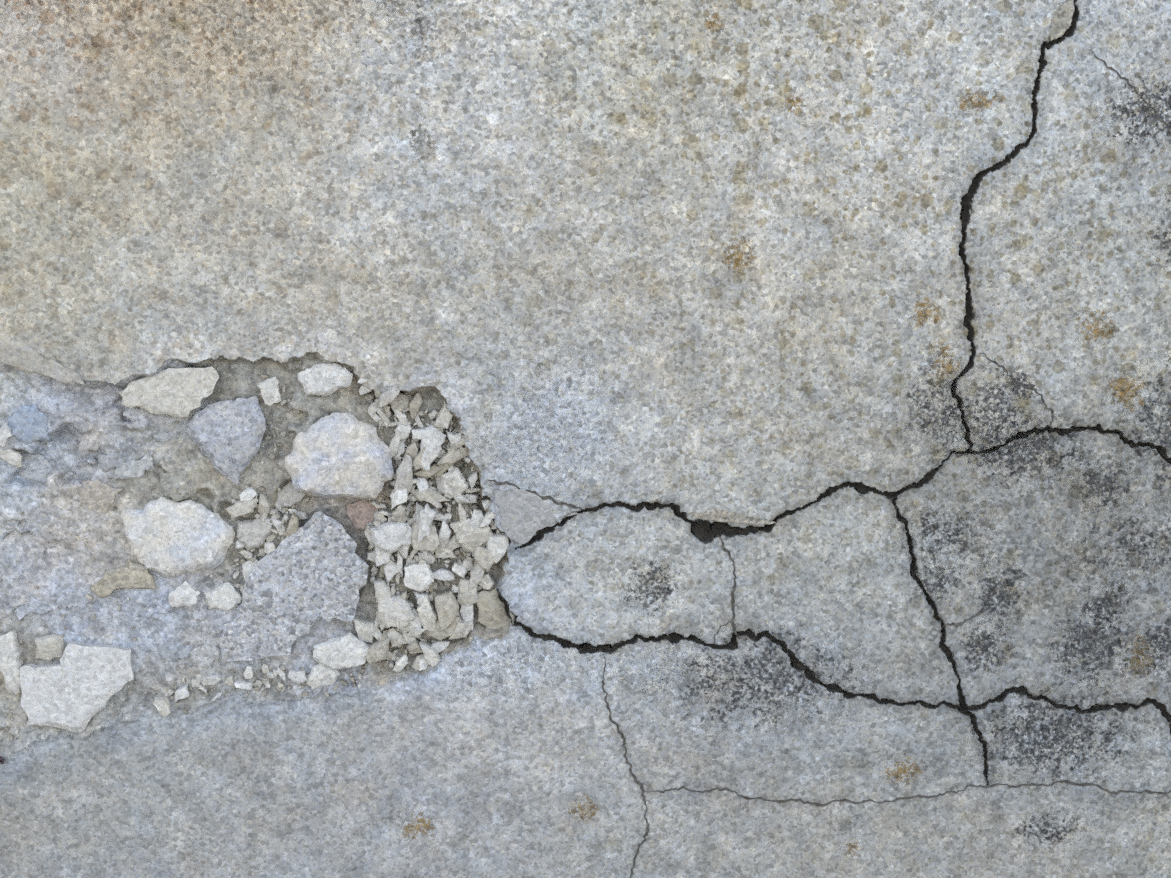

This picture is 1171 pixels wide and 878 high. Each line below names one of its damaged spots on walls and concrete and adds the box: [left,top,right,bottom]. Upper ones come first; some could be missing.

spalling [0,342,578,758]
crack [488,0,1171,878]